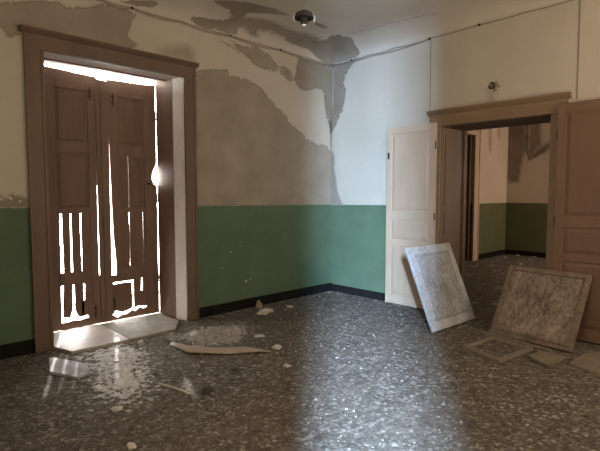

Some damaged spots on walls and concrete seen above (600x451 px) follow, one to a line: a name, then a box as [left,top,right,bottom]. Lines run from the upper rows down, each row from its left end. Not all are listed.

peeling [0,1,135,48]
peeling [191,1,288,34]
peeling [228,44,293,80]
peeling [196,70,331,206]